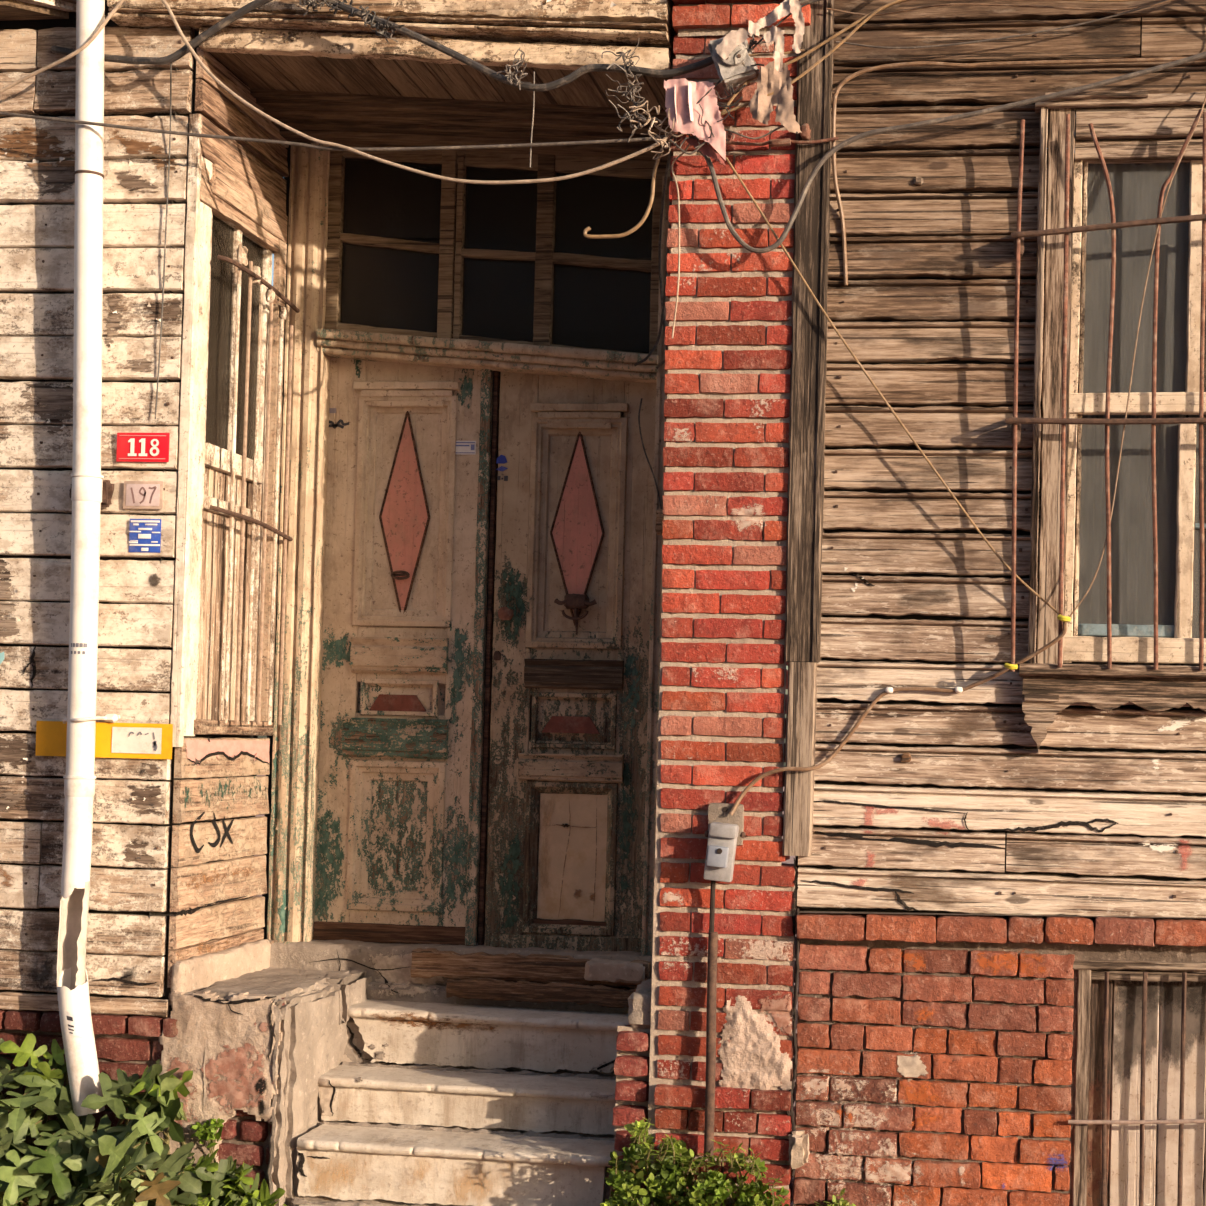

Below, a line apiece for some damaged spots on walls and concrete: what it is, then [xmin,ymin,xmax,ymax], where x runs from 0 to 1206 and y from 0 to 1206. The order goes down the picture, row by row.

peeling [103,286,154,372]
peeling [20,382,73,435]
peeling [0,559,21,637]
crack [813,800,1119,850]
peeling [315,810,347,913]
crack [314,950,444,999]
spalling [759,987,792,1036]
crack [786,858,919,1131]
crack [347,1026,414,1065]
flaking render [167,1022,274,1127]
spalling [318,1078,336,1116]
crack [298,1152,330,1177]